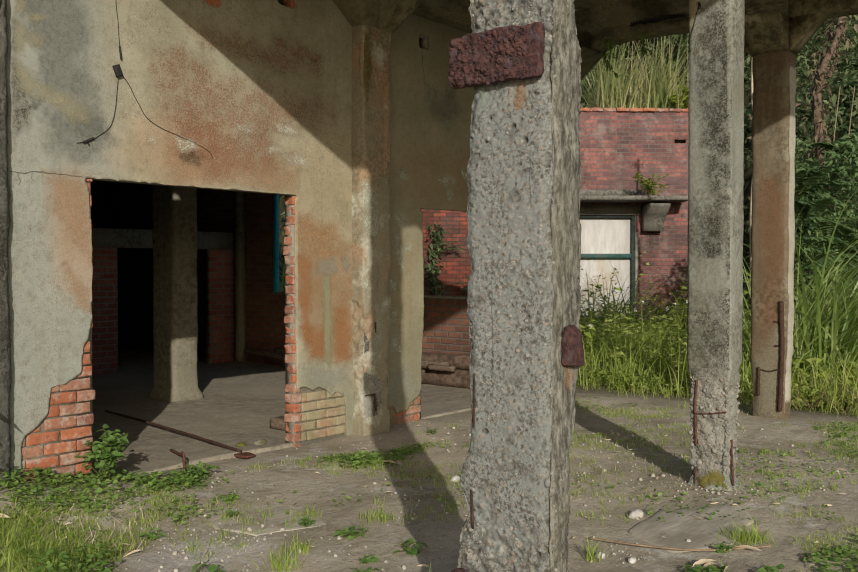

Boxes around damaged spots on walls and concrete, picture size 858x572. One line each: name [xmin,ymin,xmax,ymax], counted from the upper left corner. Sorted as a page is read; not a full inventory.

crack [624,1,701,41]
corrosion [449,26,526,109]
spalling [21,341,95,482]
spalling [301,390,346,441]
spalling [360,373,421,426]